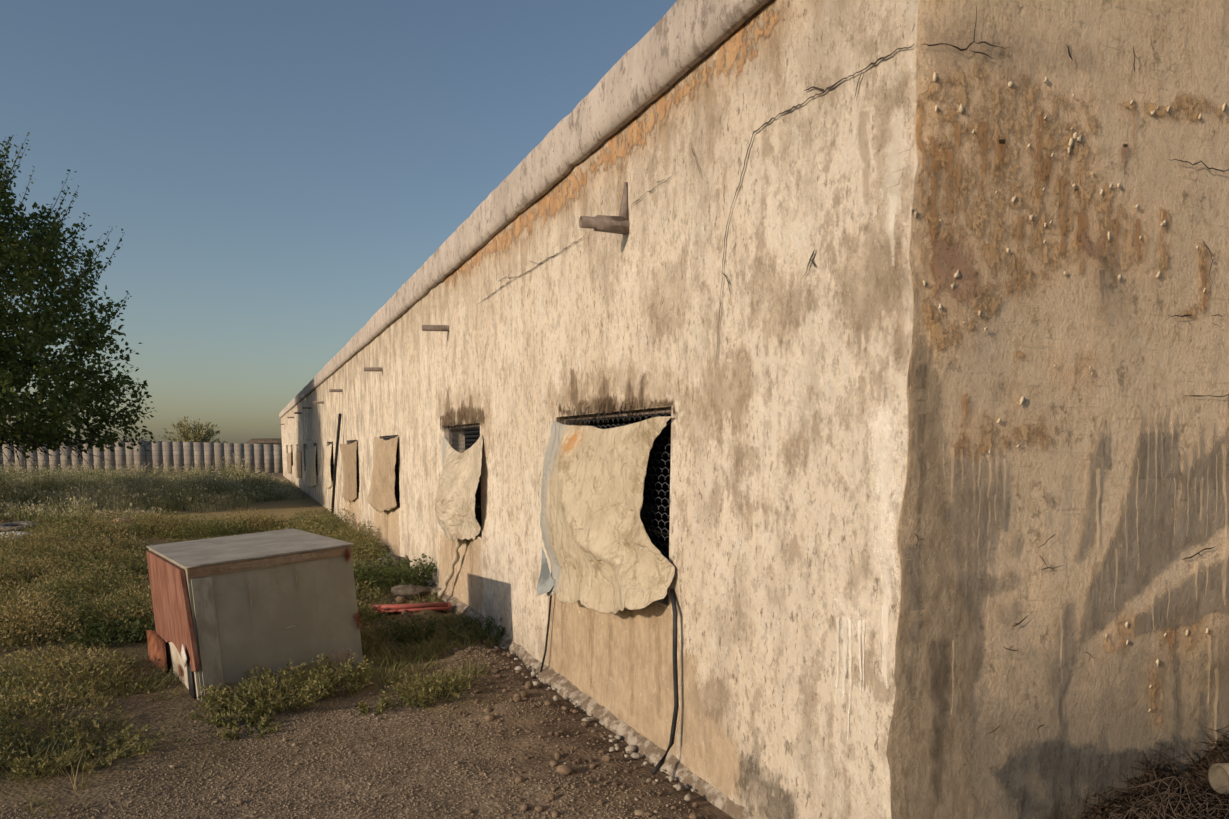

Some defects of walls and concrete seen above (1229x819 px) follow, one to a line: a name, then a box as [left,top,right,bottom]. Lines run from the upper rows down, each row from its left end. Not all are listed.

peeling [1118,92,1229,124]
crack [715,7,1008,366]
peeling [911,61,1142,351]
crack [1168,159,1229,172]
crack [476,238,582,305]
peeling [1184,242,1216,318]
water stain [597,377,644,411]
water stain [832,226,1229,819]